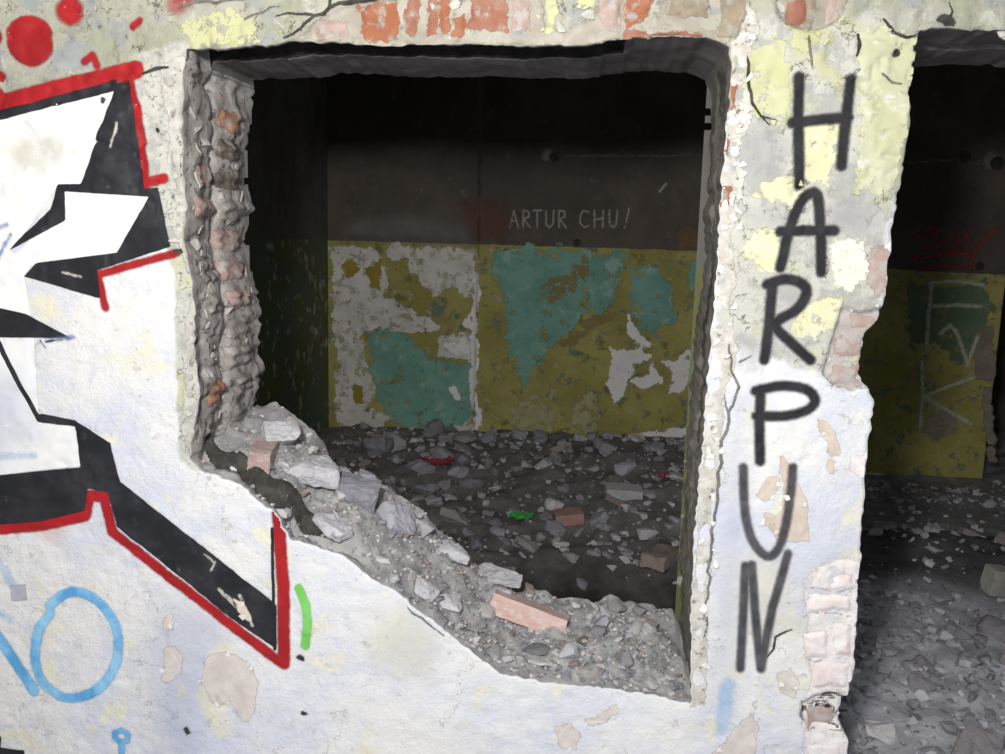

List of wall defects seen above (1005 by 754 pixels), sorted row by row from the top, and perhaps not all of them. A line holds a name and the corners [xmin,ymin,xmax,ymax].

crack [153,0,377,38]
spalling [160,6,261,455]
spalling [296,0,847,707]
spalling [791,238,890,397]
peeling [817,419,867,478]
peeling [907,278,998,463]
peeling [198,651,258,723]
peeling [233,599,252,622]
spalling [776,556,860,754]